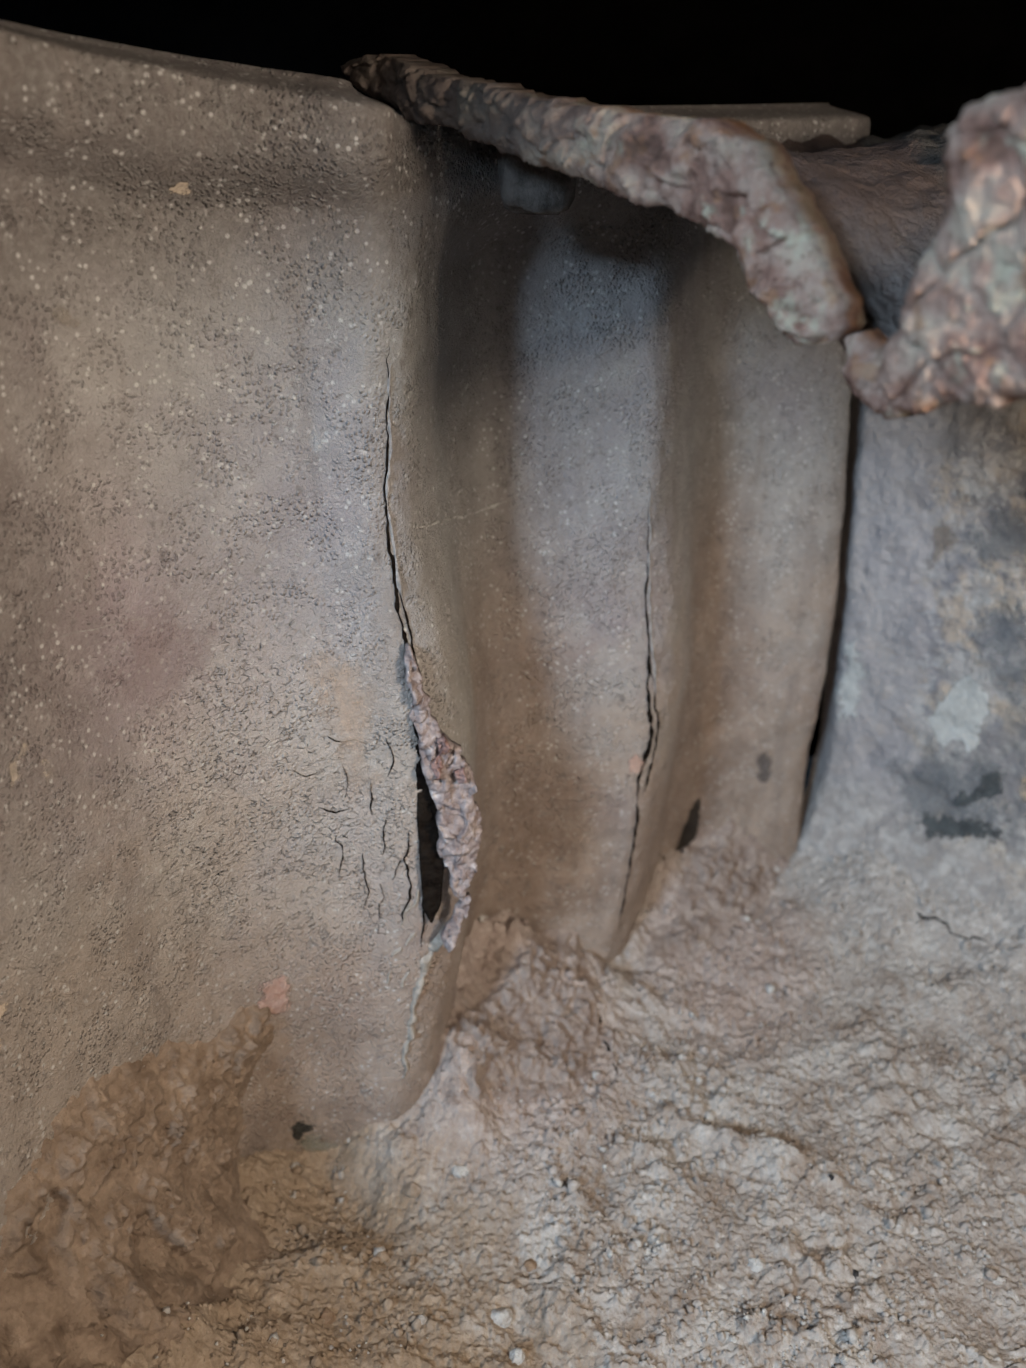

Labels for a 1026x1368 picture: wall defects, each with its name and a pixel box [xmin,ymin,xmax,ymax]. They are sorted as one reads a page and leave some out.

spalling [340,54,866,345]
crack [290,346,425,945]
spalling [386,733,472,1079]
crack [619,484,660,927]